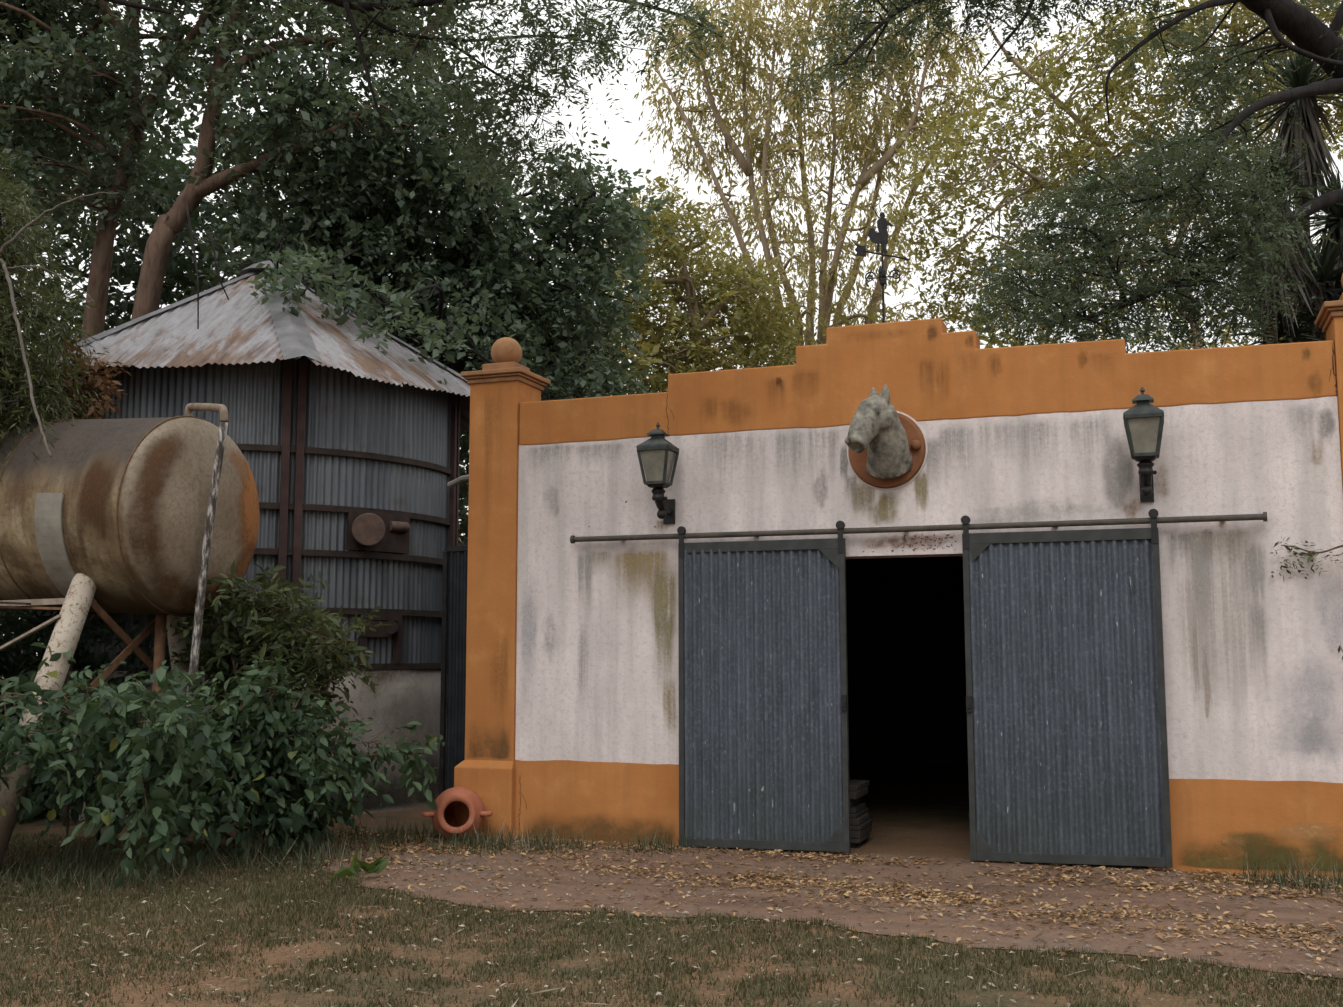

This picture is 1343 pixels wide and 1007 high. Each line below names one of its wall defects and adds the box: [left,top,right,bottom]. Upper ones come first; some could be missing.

damp [578,552,675,655]
damp [1171,532,1264,661]